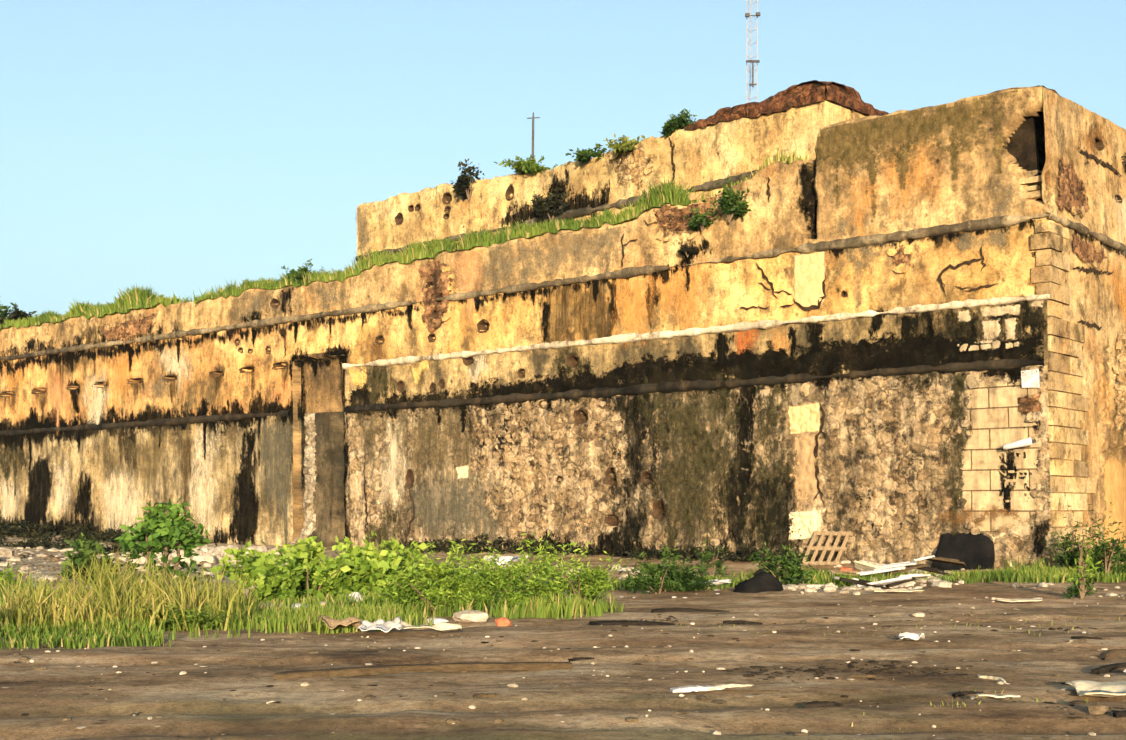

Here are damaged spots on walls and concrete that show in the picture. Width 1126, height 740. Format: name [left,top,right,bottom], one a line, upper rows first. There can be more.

leakage [837,156,877,233]
leakage [895,145,910,190]
leakage [949,133,959,191]
leakage [993,106,1009,174]
leakage [1034,124,1050,191]
spalling [418,258,458,334]
crack [739,263,826,311]
crack [937,246,997,297]
leakage [0,163,1049,559]
spalling [1113,332,1126,439]
spalling [816,375,1043,562]
peeling [1103,454,1126,553]